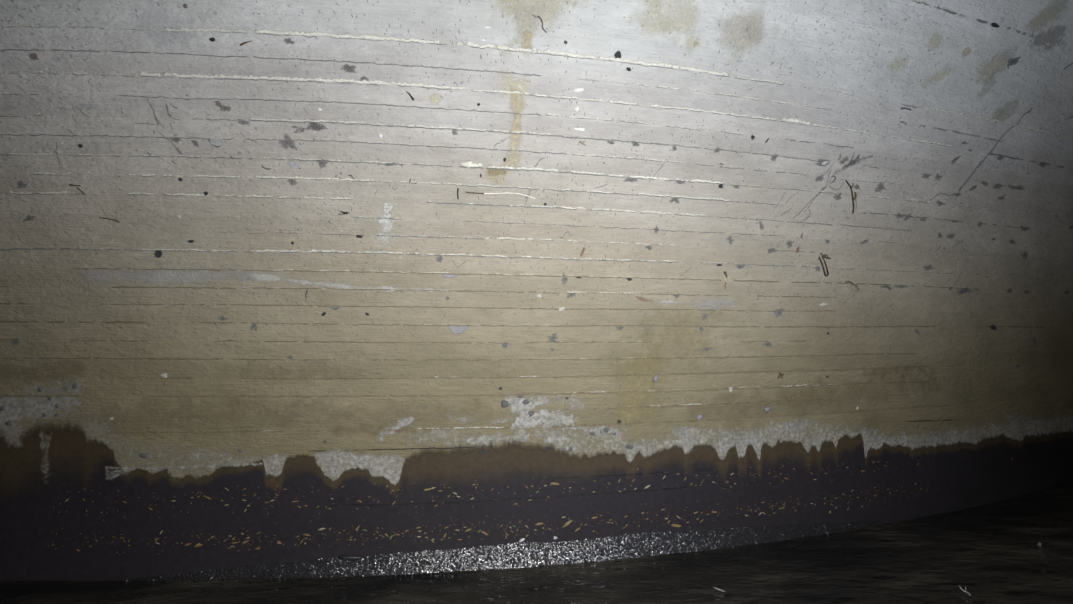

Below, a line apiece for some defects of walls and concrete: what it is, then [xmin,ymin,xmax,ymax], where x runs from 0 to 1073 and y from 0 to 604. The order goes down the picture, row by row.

crack [929,108,1032,201]
water stain [0,426,1073,581]